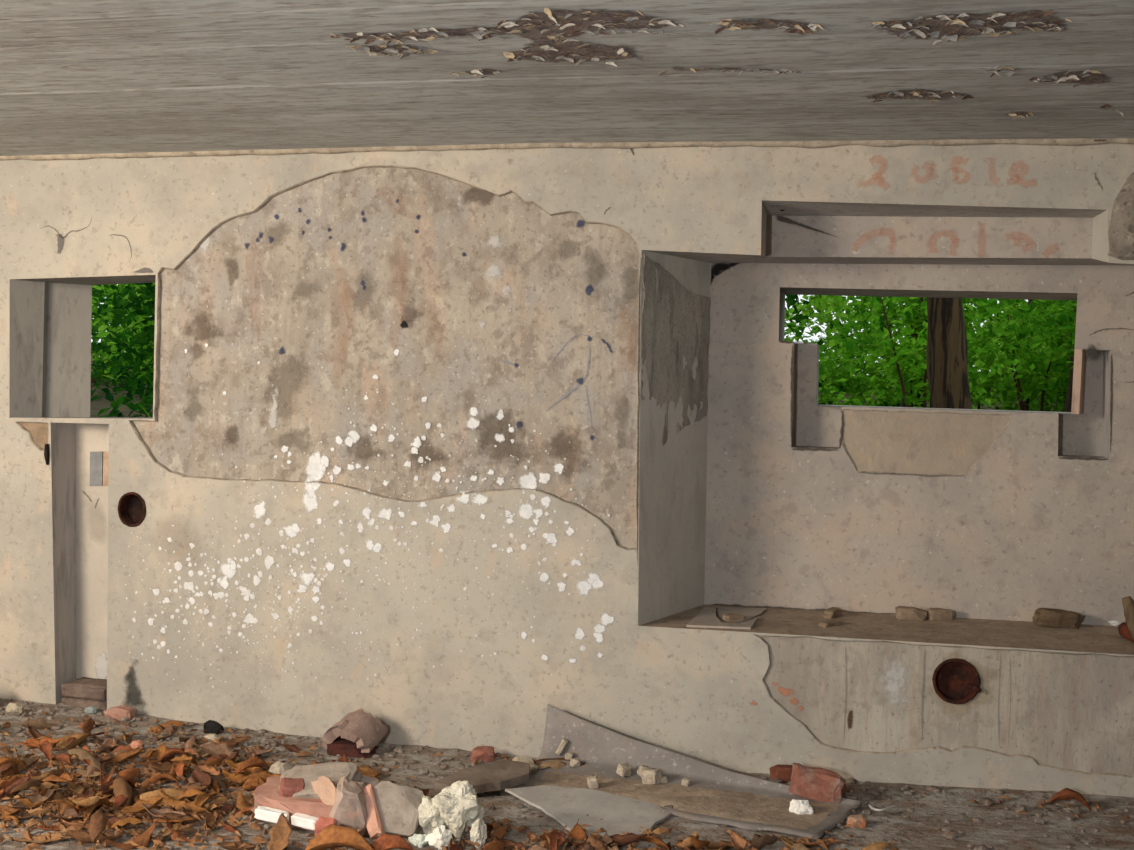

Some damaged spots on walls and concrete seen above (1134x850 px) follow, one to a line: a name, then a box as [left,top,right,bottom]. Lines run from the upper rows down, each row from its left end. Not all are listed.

damp [269,385,278,428]
spalling [129,165,710,550]
spalling [711,263,740,283]
spalling [686,607,1134,778]